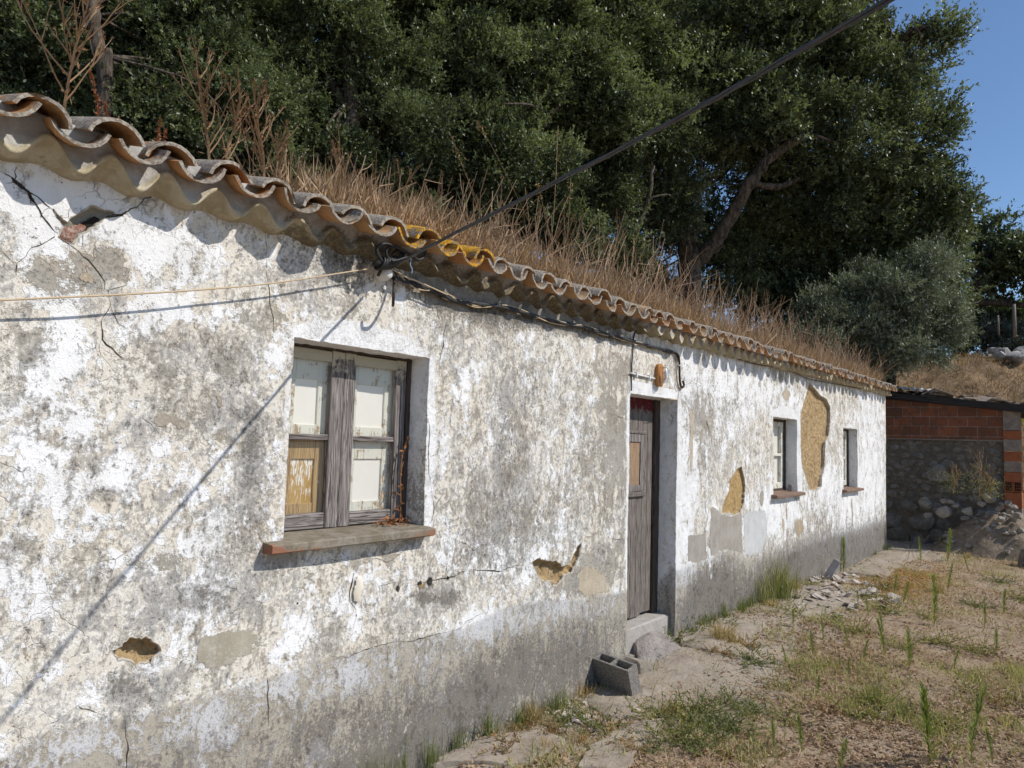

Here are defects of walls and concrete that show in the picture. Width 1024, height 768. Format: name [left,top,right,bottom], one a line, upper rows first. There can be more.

flaking render [54,205,116,245]
crack [103,196,152,219]
crack [0,168,128,359]
flaking render [800,383,831,492]
flaking render [722,465,746,516]
flaking render [532,542,609,597]
crack [297,542,527,667]
water stain [411,586,461,610]
flaking render [112,635,162,668]